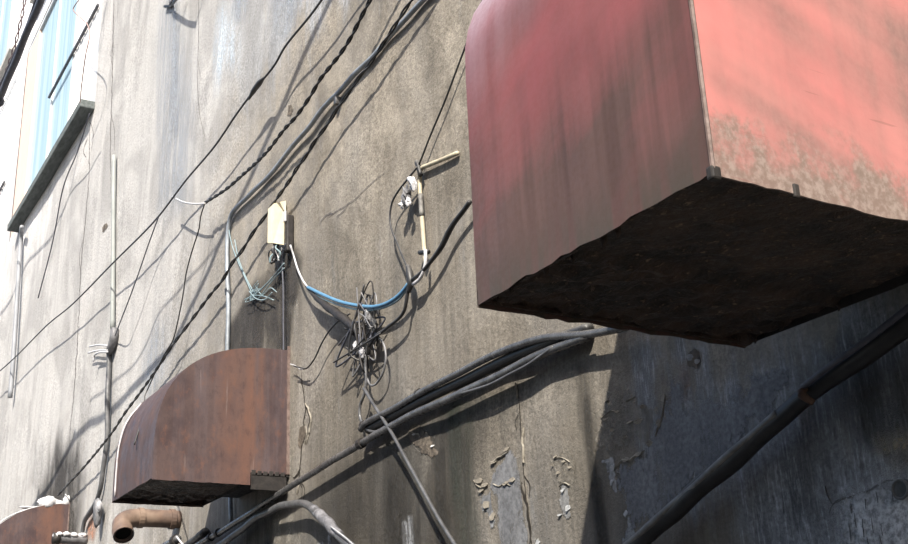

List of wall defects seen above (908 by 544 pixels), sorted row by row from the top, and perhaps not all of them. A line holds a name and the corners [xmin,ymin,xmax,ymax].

peeling [473,447,540,544]
crack [515,382,532,544]
peeling [550,455,572,519]
peeling [596,388,659,492]